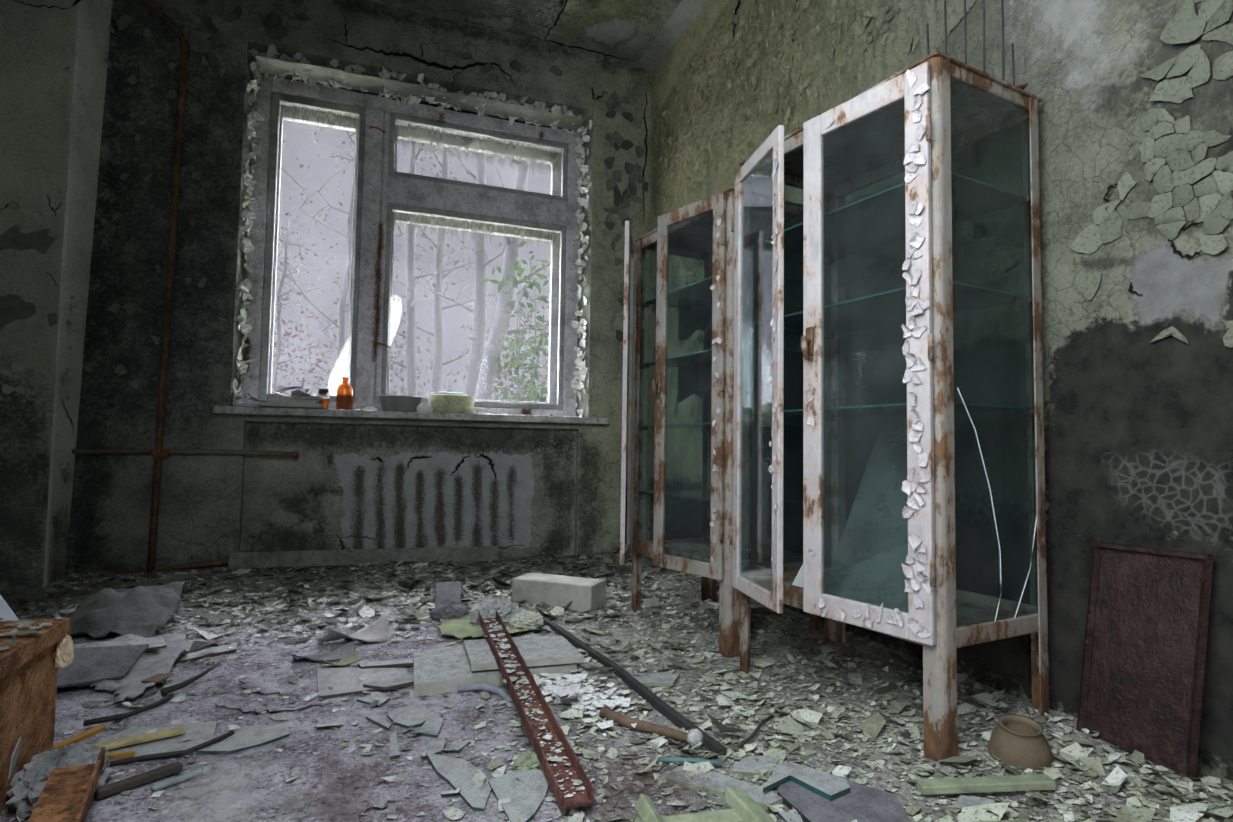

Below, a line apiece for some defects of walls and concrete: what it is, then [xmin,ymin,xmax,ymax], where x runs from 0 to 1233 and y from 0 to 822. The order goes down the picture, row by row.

crack [12,0,81,10]
crack [256,16,608,132]
flaking render [992,0,1127,107]
peeling [233,0,919,417]
crack [525,36,650,227]
peeling [1070,0,1233,347]
peeling [751,361,792,446]
crack [369,453,497,483]
damp [751,471,803,554]
damp [846,472,908,579]
damp [955,492,1030,604]
damp [1044,317,1233,780]